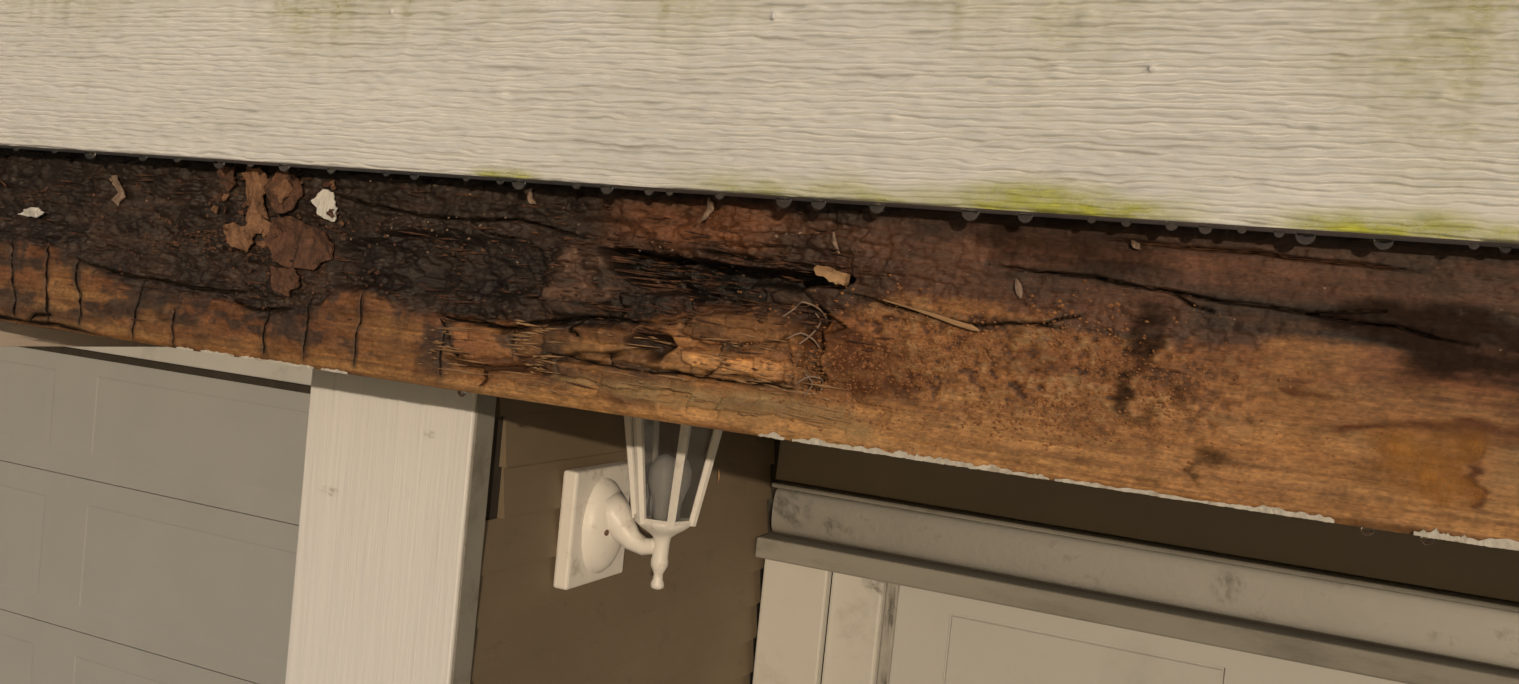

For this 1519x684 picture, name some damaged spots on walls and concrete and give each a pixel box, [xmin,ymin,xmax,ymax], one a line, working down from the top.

peeling [109,175,125,206]
peeling [19,207,45,218]
peeling [211,165,345,252]
water stain [973,189,1147,265]
water stain [1307,218,1474,240]
crack [697,249,814,269]
crack [1104,238,1420,273]
peeling [269,265,300,297]
crack [847,293,1079,329]
crack [990,264,1476,346]
peeling [176,347,348,374]
water stain [1338,418,1515,508]